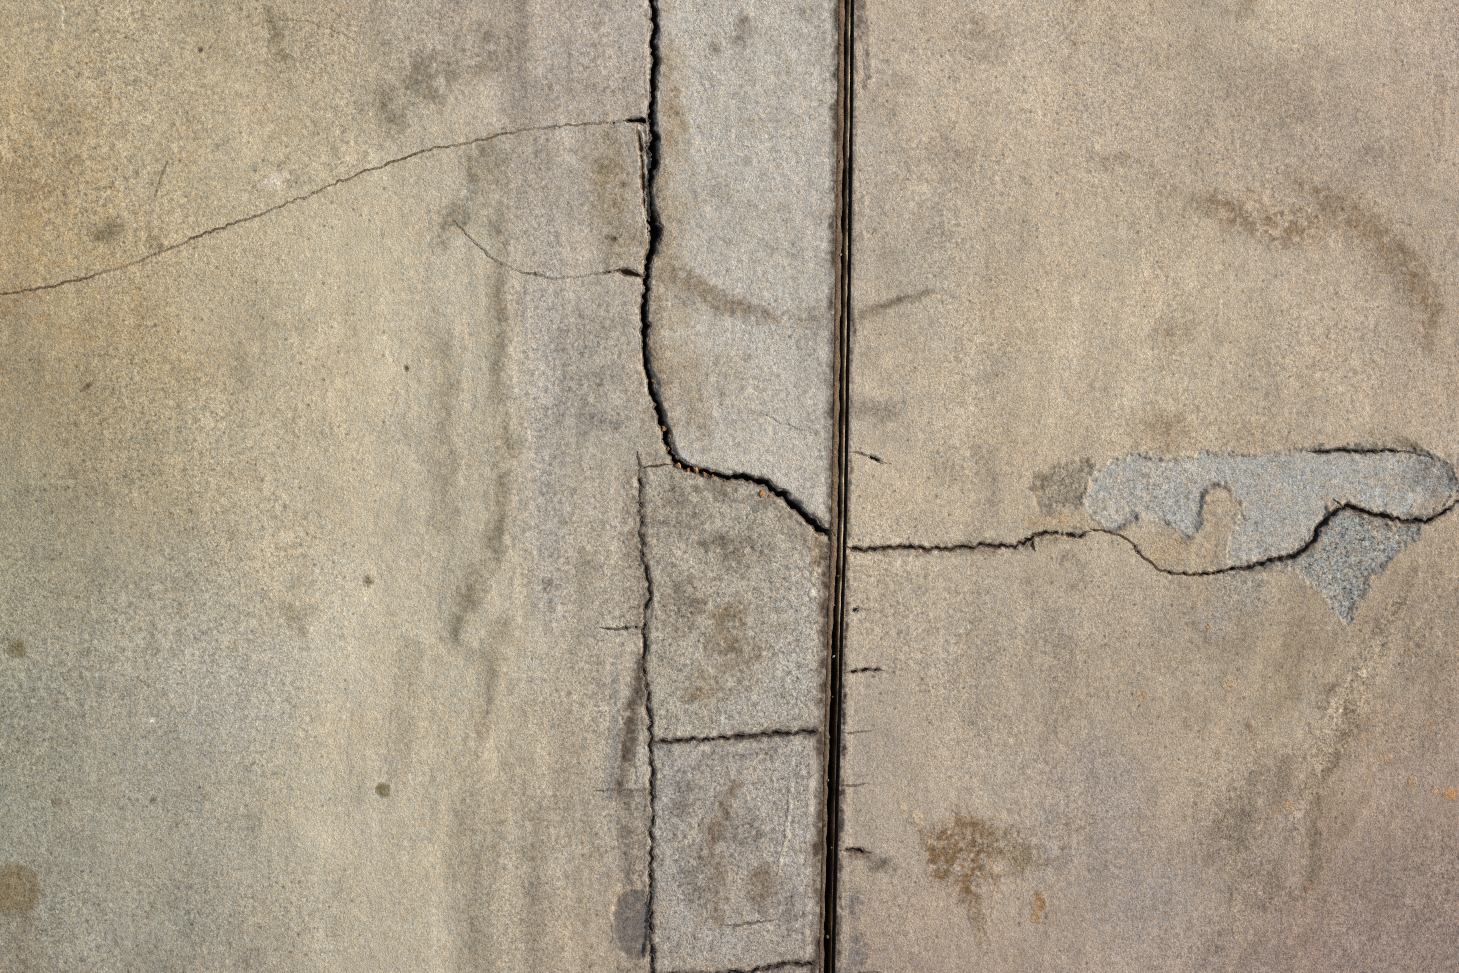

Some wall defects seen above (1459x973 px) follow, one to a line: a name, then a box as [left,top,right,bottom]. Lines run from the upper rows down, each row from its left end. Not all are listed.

crack [0,0,836,973]
crack [850,451,892,465]
crack [845,497,1459,578]
peeling [1028,438,1457,631]
corrosion [898,796,1050,957]